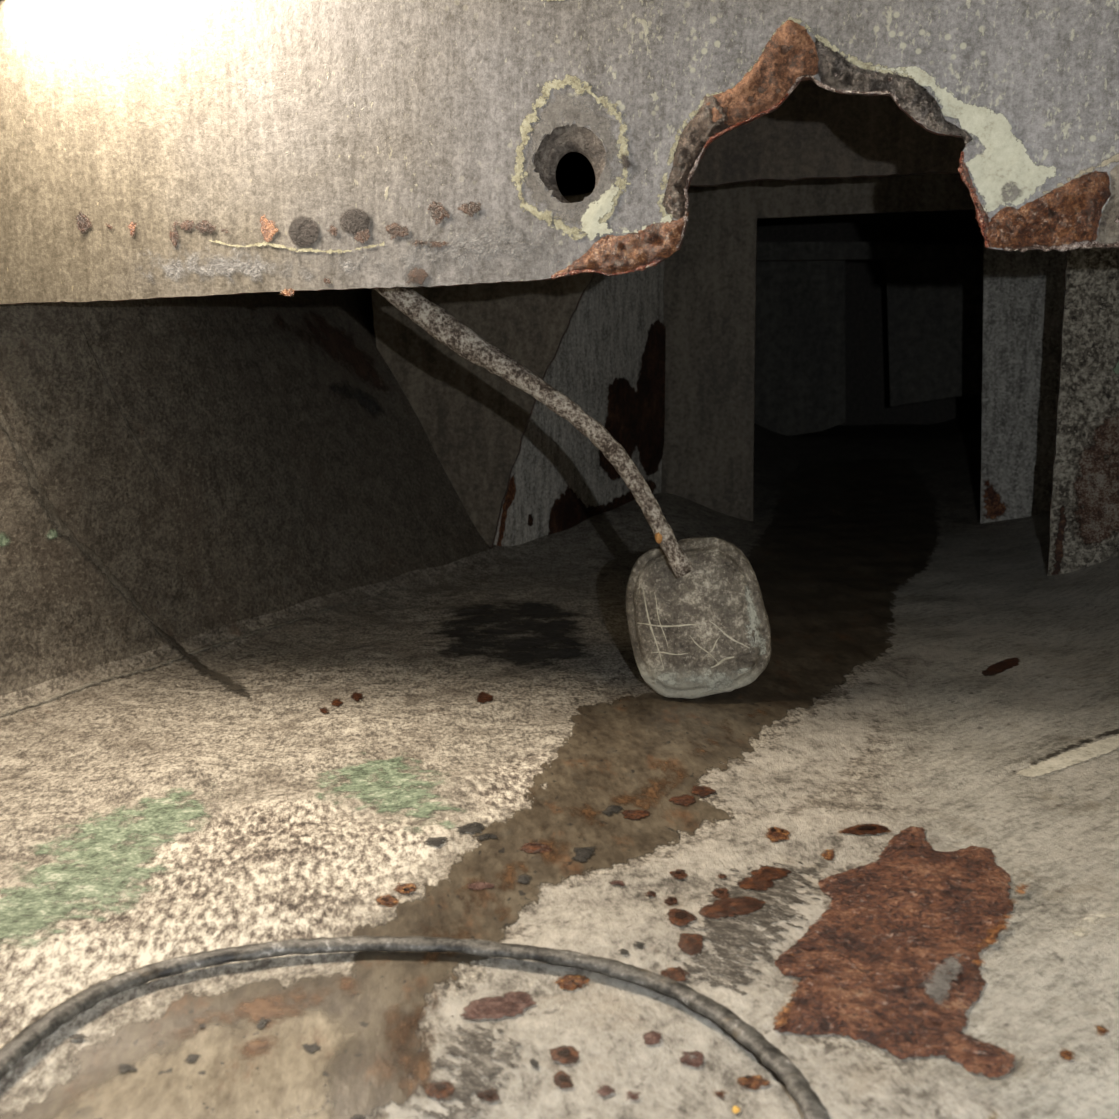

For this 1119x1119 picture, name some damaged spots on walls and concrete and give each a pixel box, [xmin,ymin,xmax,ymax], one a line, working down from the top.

peeling [580,17,1119,241]
corrosion [605,320,666,494]
corrosion [598,450,621,481]
corrosion [548,485,635,535]
corrosion [1051,492,1067,576]
damp [0,458,942,1119]
corrosion [767,827,790,842]
corrosion [773,824,1028,1078]
corrosion [1060,1049,1075,1060]